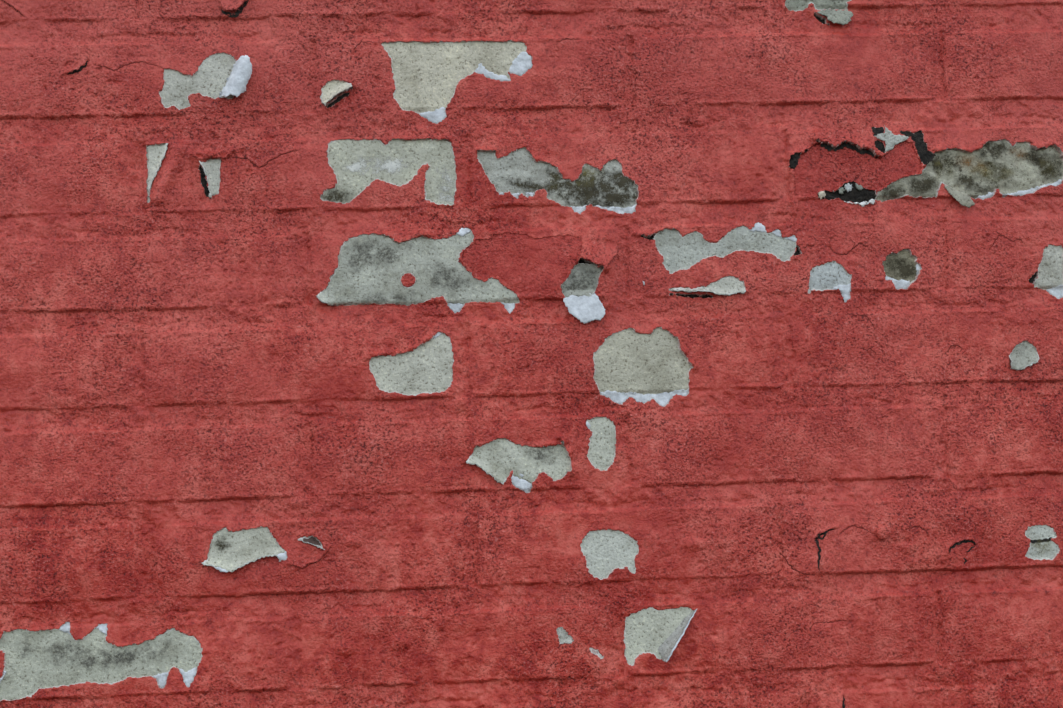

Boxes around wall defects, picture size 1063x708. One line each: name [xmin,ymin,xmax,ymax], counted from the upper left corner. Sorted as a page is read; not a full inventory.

peeling [382,41,533,124]
peeling [320,139,457,206]
peeling [789,127,1063,208]
peeling [317,228,519,313]
peeling [641,222,800,274]
peeling [369,332,454,396]
peeling [593,327,692,407]
peeling [466,439,571,493]
peeling [202,527,329,572]
peeling [580,529,639,580]
peeling [0,622,203,701]
peeling [624,607,697,666]